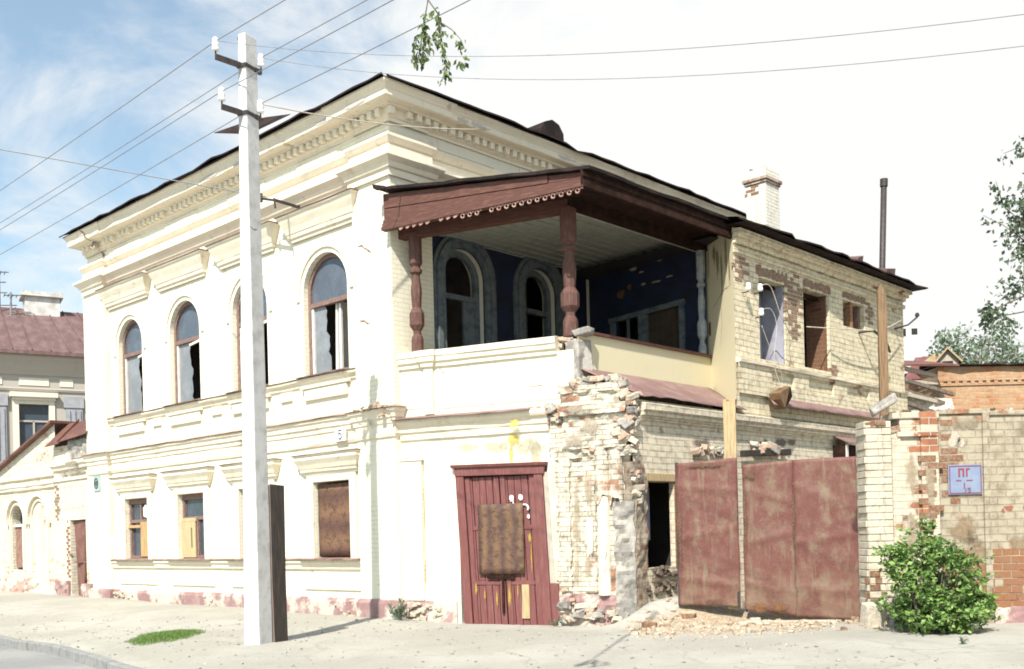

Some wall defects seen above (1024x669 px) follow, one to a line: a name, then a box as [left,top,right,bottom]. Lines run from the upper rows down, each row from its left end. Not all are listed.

flaking render [54,485,72,578]
rust [318,482,351,556]
rust [478,503,525,574]
spalling [529,337,671,629]
rust [743,469,754,545]
flaking render [902,420,965,533]
flaking render [942,548,1024,608]